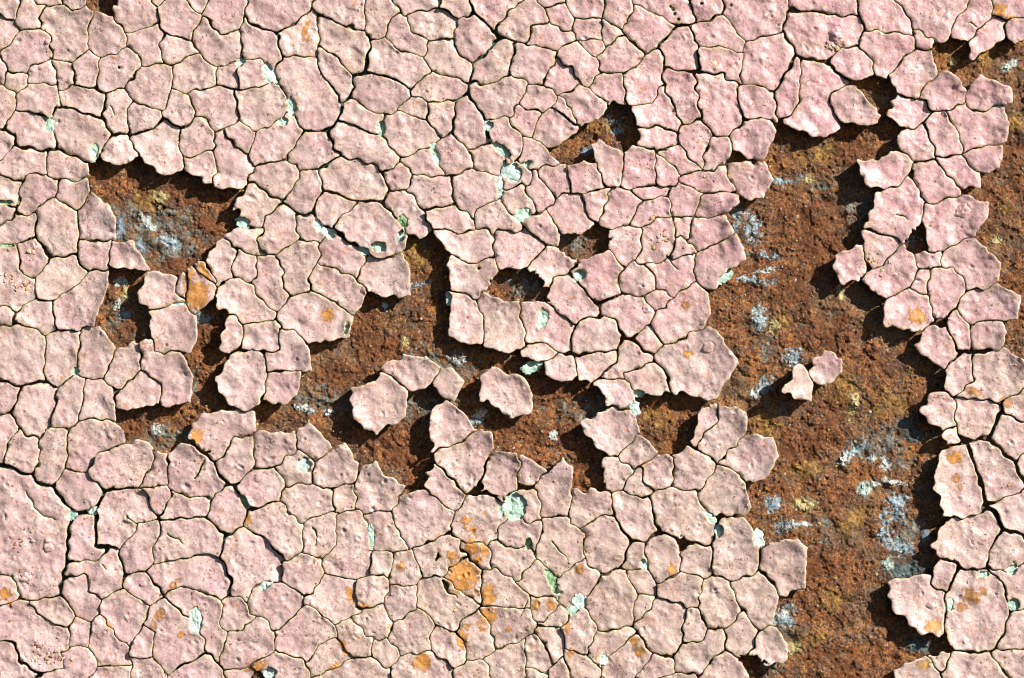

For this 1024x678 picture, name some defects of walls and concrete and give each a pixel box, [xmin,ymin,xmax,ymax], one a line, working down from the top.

crack [246,17,475,226]
crack [446,7,527,146]
crack [769,6,871,110]
crack [0,460,190,619]
rust [75,149,253,367]
peeling [0,173,354,678]
crack [127,460,281,599]
rust [106,221,734,503]
rust [446,515,498,650]
peeling [262,0,1024,678]
rust [695,28,1024,678]
crack [940,400,1024,620]